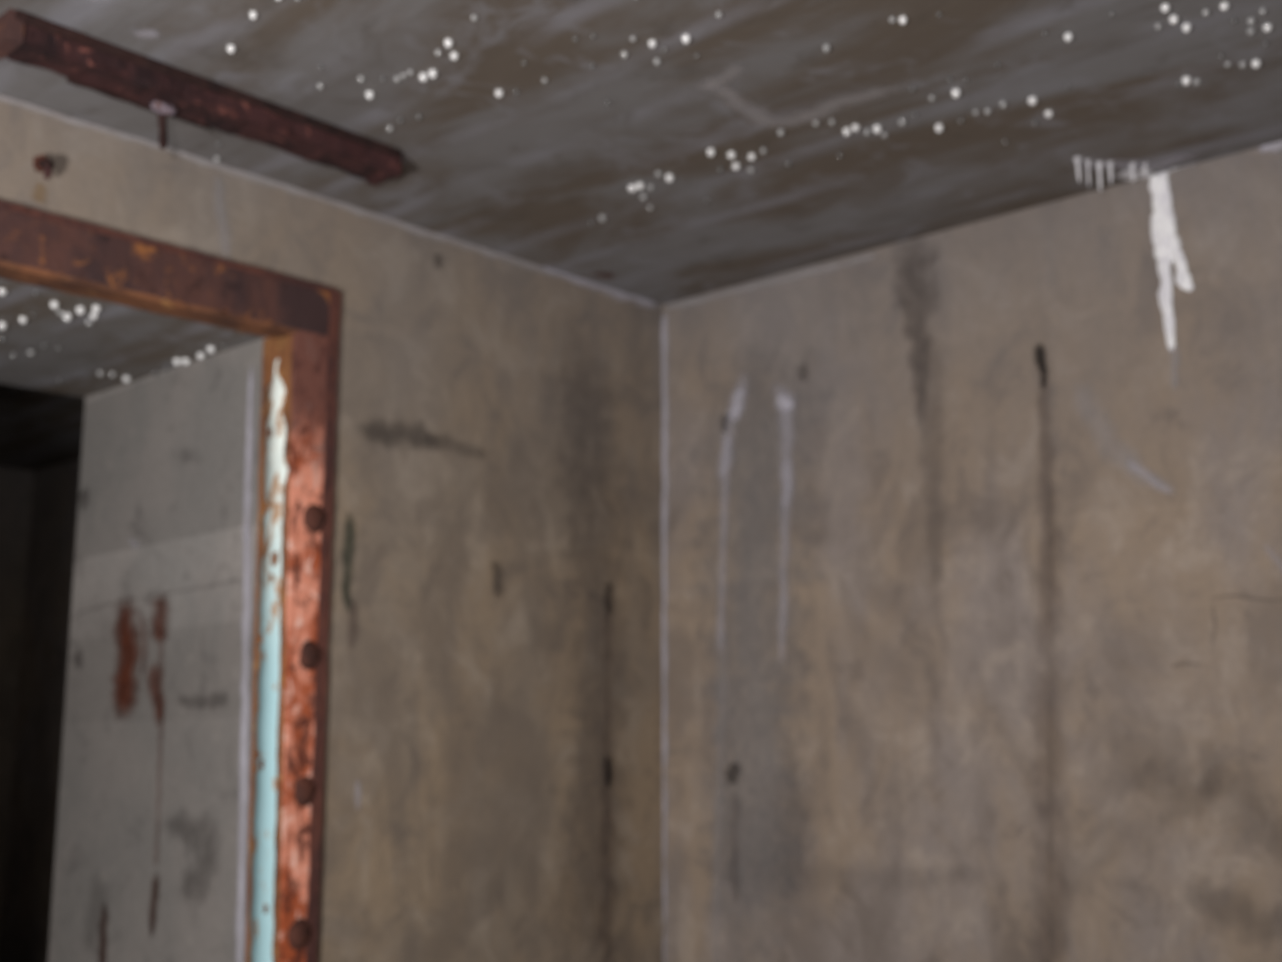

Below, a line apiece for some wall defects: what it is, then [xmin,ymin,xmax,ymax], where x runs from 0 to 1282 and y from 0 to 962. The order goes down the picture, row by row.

corrosion [66,78,210,129]
corrosion [0,200,341,962]
damp [0,95,872,962]
damp [1073,156,1202,351]